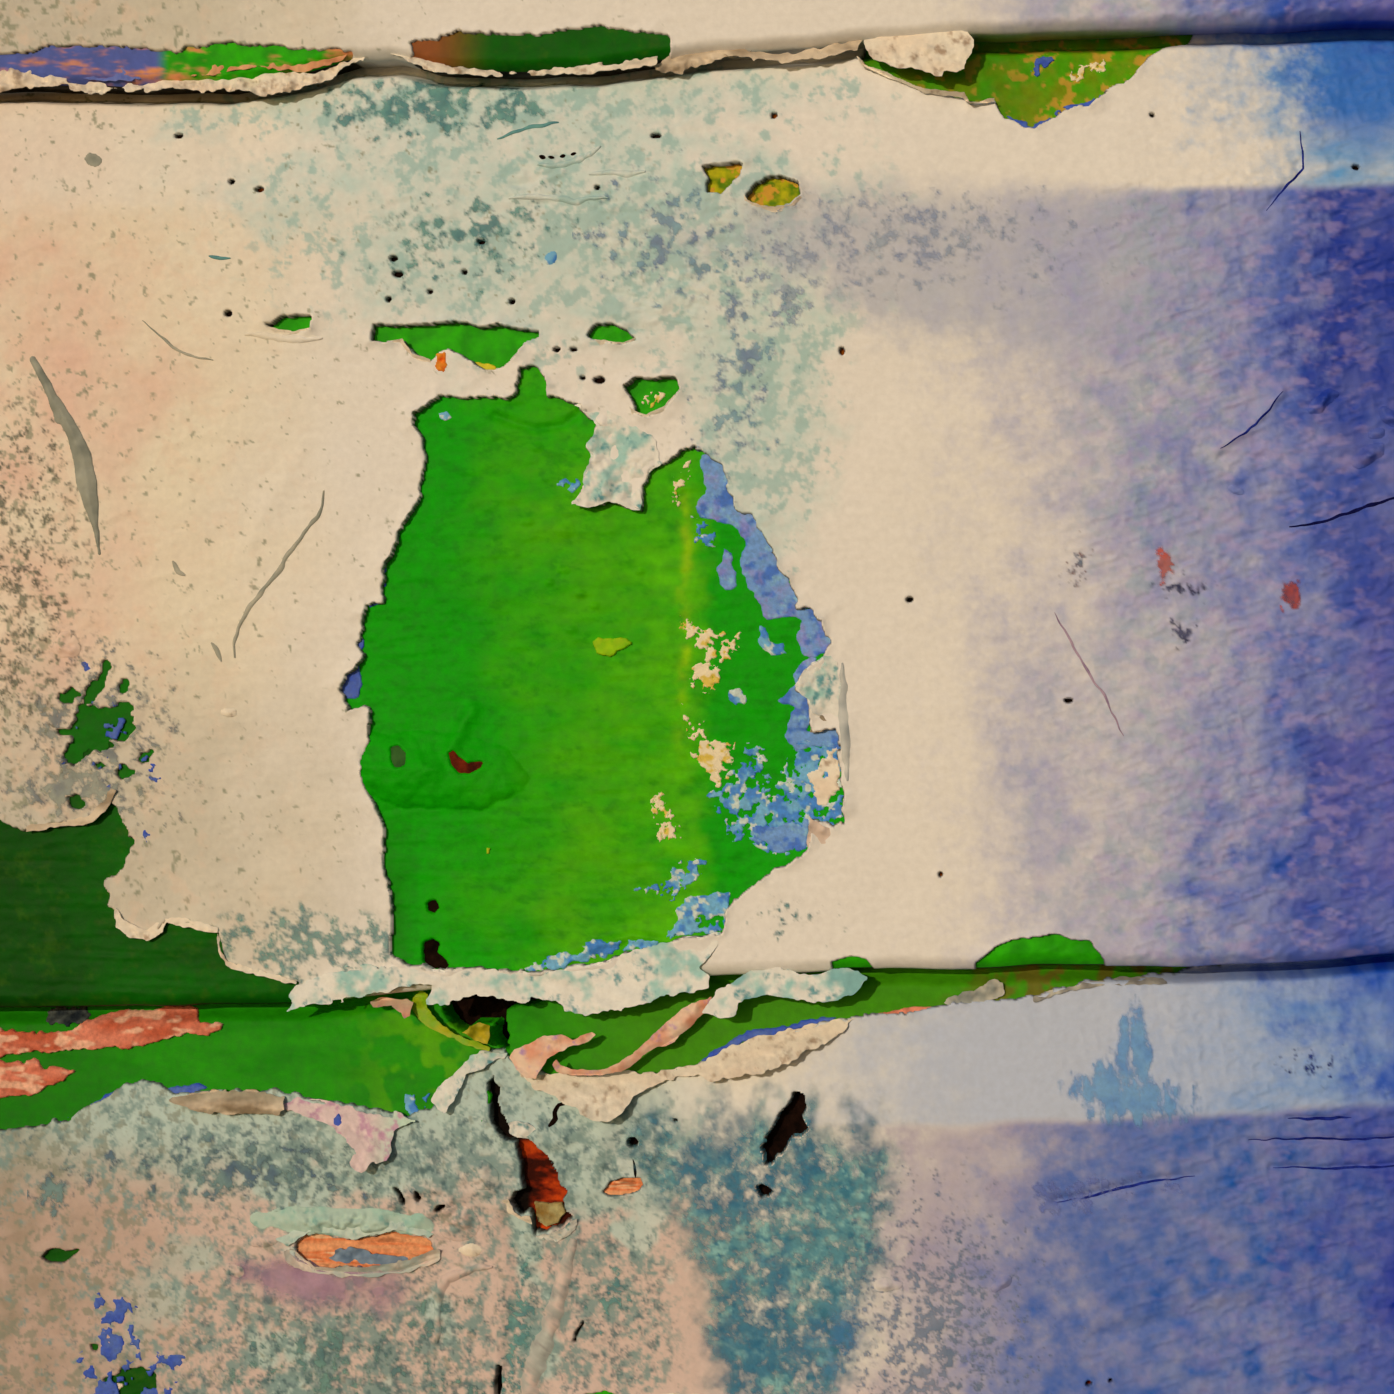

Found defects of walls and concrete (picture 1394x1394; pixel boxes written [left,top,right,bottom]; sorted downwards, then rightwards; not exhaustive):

peeling [0,43,365,97]
peeling [391,26,1192,128]
peeling [705,165,742,194]
peeling [744,179,802,212]
peeling [0,324,1192,1173]
peeling [76,1292,186,1394]